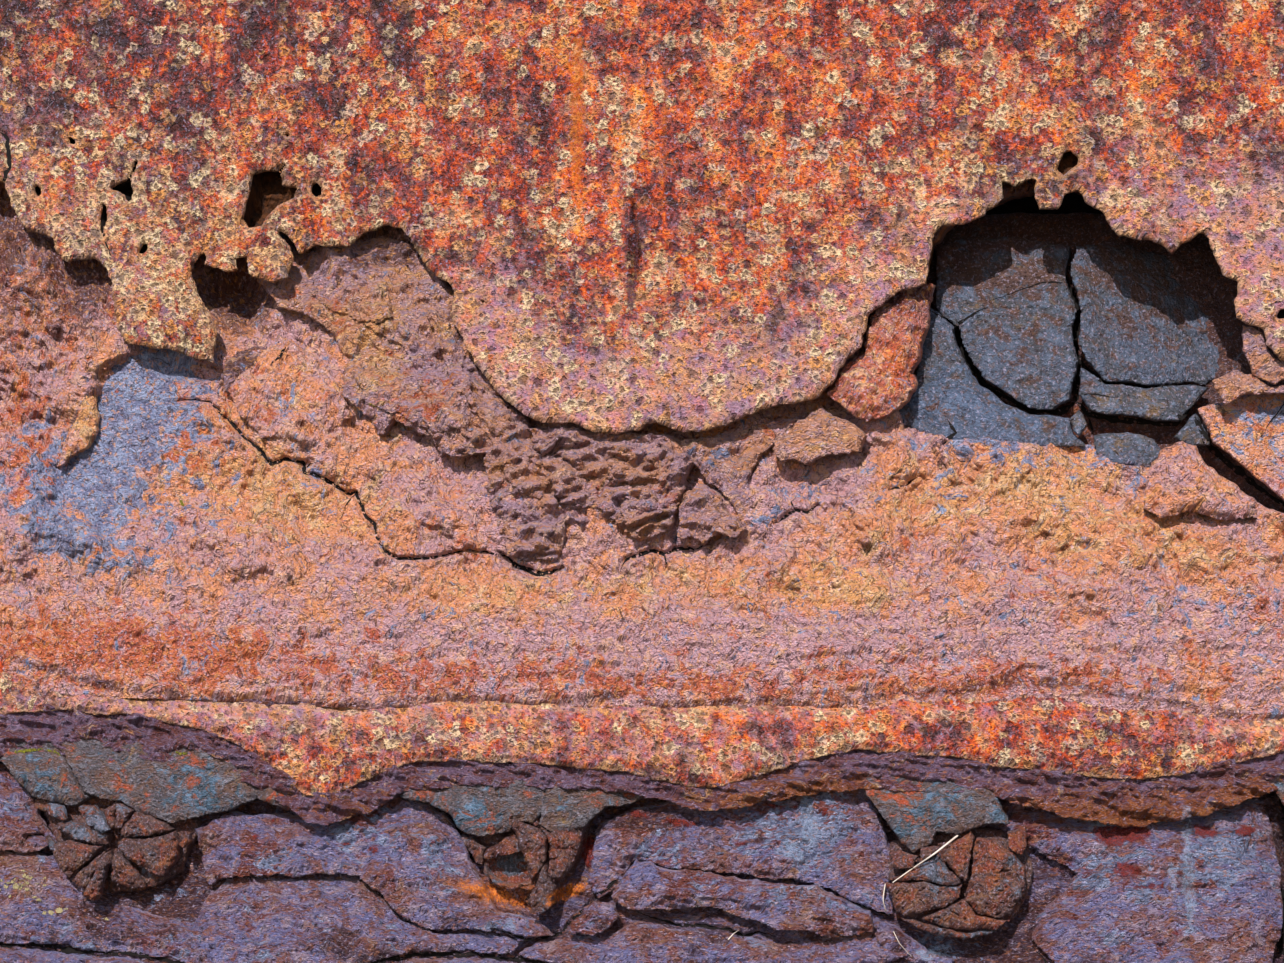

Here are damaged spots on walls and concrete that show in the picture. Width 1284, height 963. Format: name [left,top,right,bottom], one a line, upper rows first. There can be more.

peeling [1241,305,1284,385]
spalling [55,229,936,562]
crack [928,277,1284,506]
crack [179,399,563,577]
rust [0,179,1284,721]
crack [776,497,816,523]
peeling [1143,441,1257,521]
crack [620,544,710,572]
crack [0,942,185,963]
crack [373,877,619,963]
crack [641,913,776,938]
crack [1276,889,1284,963]